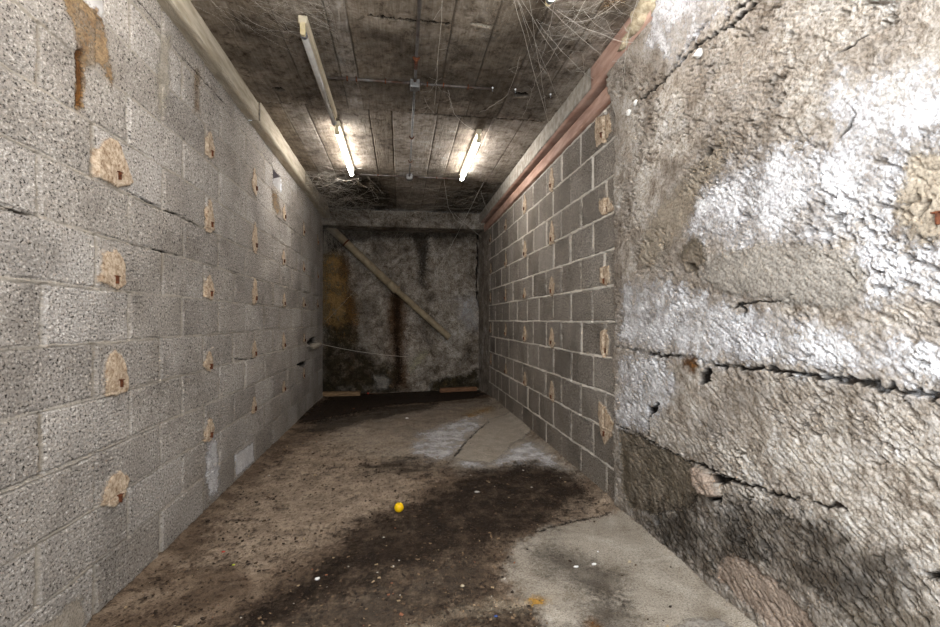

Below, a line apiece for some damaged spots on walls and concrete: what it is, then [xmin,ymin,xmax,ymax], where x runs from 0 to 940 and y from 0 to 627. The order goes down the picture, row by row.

rust [64,0,113,110]
crack [641,0,758,100]
crack [735,300,781,315]
leakage [298,316,487,433]
crack [617,346,681,358]
crack [704,363,940,402]
leakage [362,410,485,474]
leakage [240,442,591,627]
leakage [539,548,629,627]
leakage [655,495,773,576]
leakage [794,519,907,627]